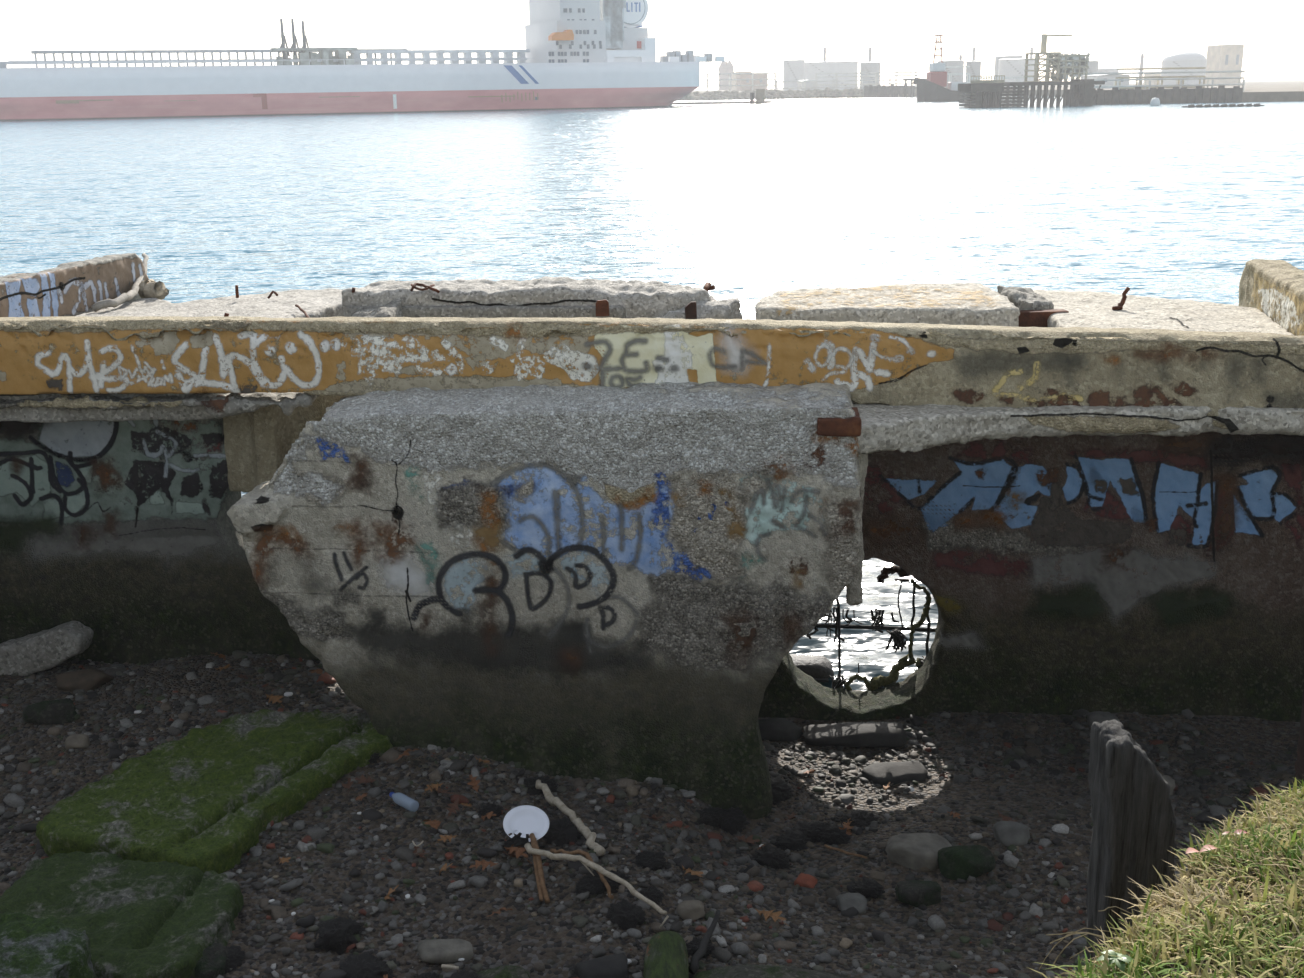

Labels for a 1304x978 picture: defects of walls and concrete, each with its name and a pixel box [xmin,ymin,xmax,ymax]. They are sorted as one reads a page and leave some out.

corrosion [953,381,1197,407]
spalling [0,304,860,671]
water stain [0,516,57,553]
spalling [877,565,910,583]
water stain [351,606,650,677]